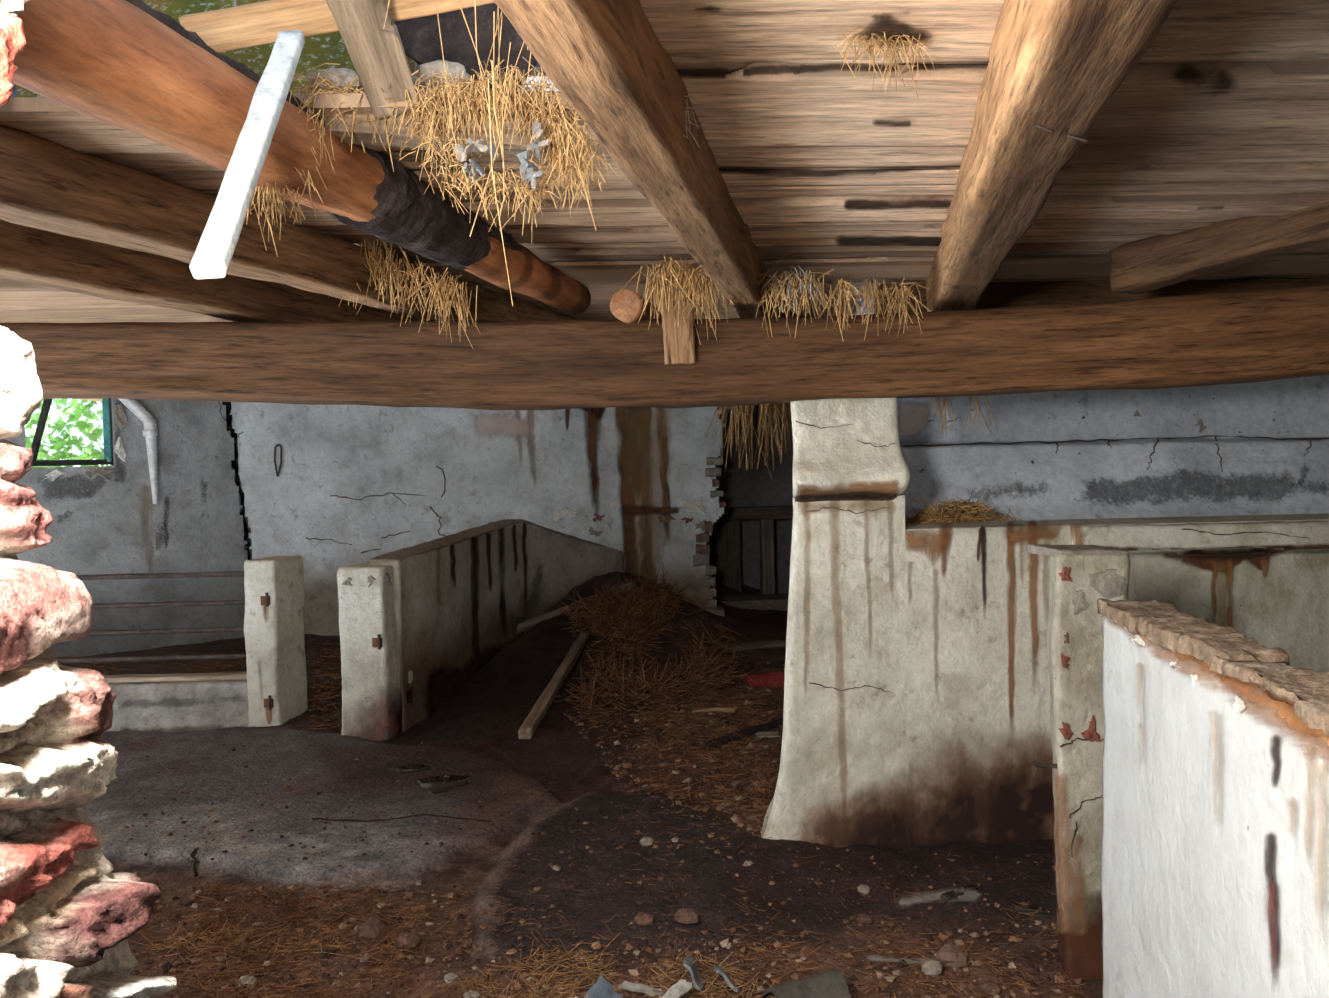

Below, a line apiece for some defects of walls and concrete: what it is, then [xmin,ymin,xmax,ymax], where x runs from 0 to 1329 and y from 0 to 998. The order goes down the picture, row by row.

crack [219,402,250,560]
damp [351,522,527,741]
flaking render [589,501,620,537]
spalling [658,457,726,617]
corrosion [905,526,952,574]
corrosion [1007,522,1057,719]
peeling [1057,566,1329,760]
corrosion [1163,548,1284,628]
damp [1270,735,1279,786]
damp [802,737,1103,979]
damp [1264,833,1277,974]